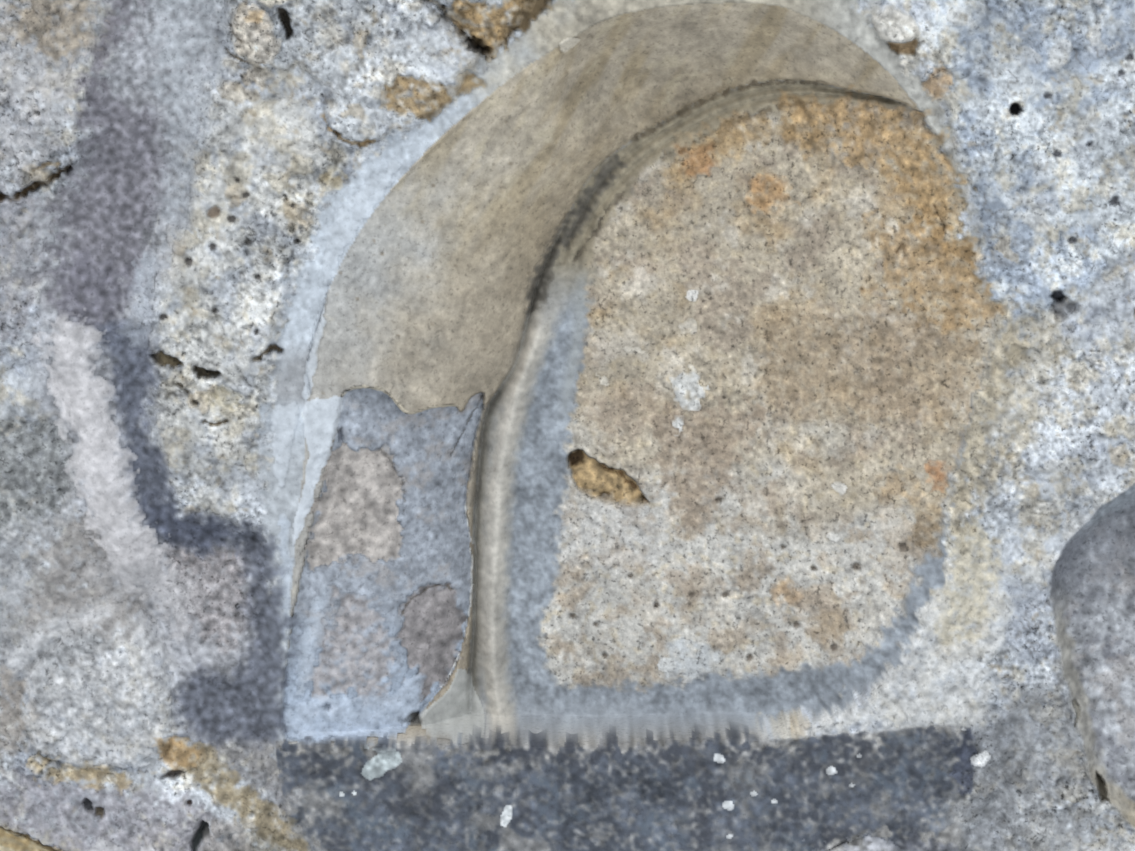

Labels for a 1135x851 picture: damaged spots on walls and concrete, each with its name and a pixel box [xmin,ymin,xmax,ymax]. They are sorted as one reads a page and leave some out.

spalling [207,206,235,225]
peeling [321,156,402,285]
spalling [568,450,584,468]
peeling [599,464,647,501]
spalling [270,299,485,744]